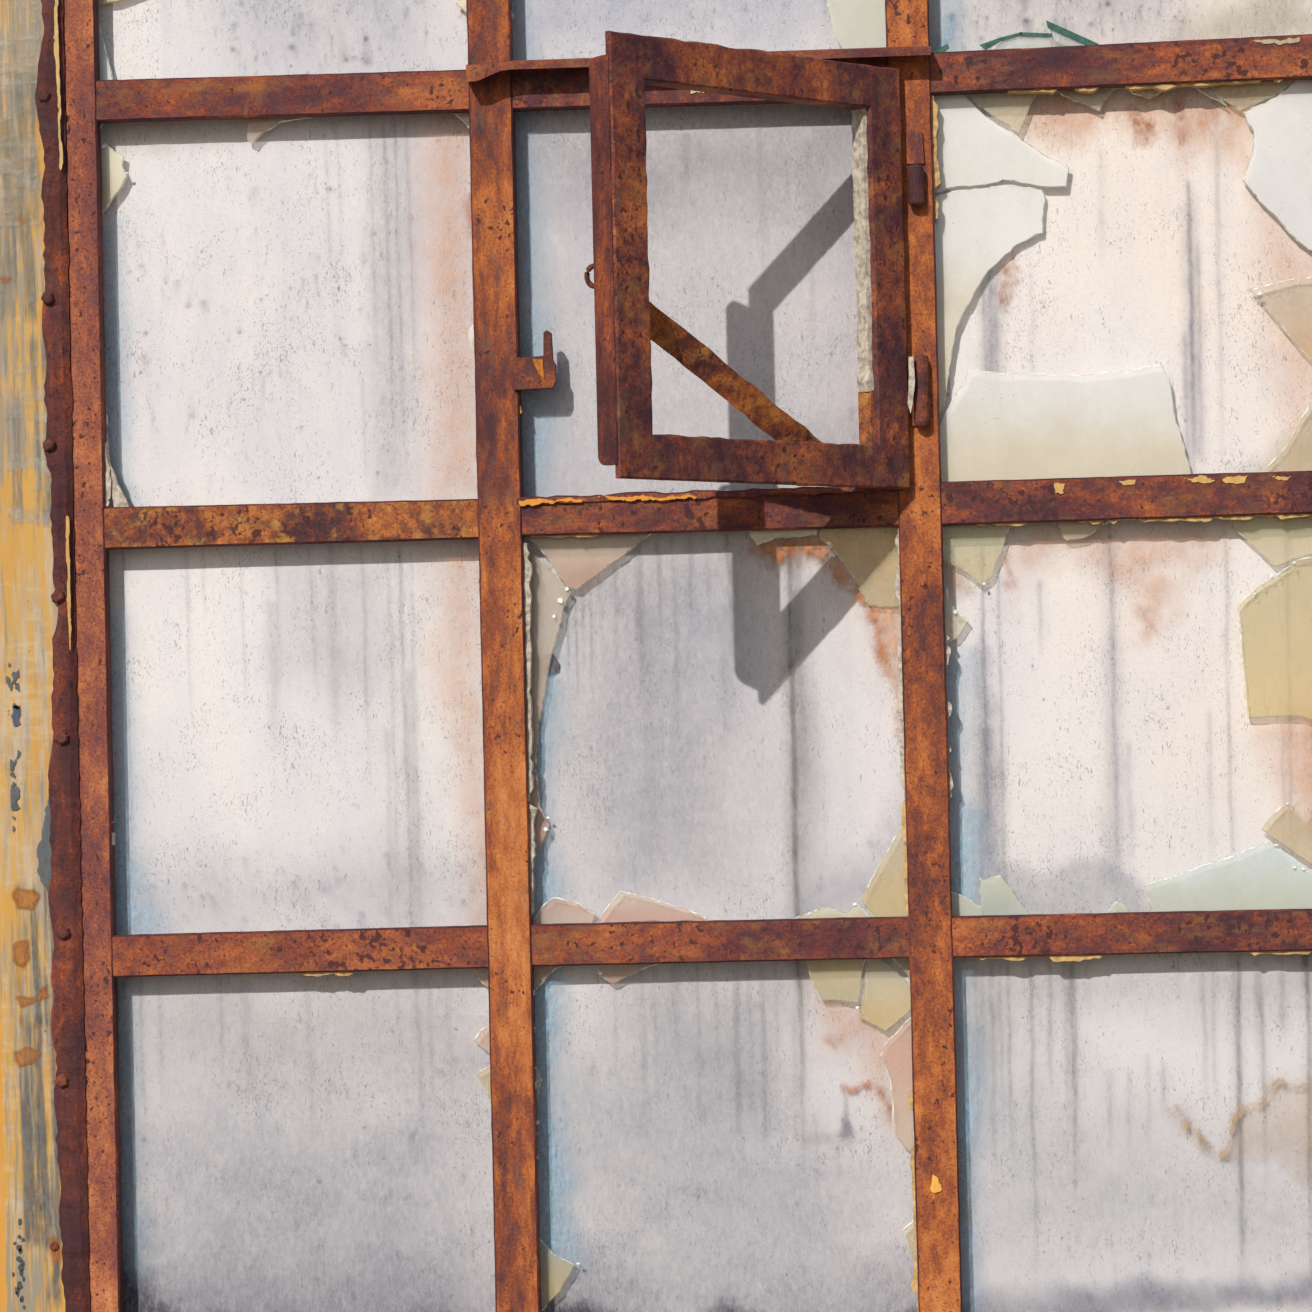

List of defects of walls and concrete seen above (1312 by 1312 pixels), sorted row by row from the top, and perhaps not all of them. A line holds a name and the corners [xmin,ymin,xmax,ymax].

peeling [36,0,63,170]
peeling [1,79,35,314]
rust [858,391,874,445]
rust [751,534,896,674]
peeling [6,663,21,726]
peeling [10,750,20,832]
rust [12,888,39,909]
rust [13,940,29,967]
rust [16,986,48,1008]
rust [14,1047,40,1067]
peeling [12,796,61,1309]
damp [123,1261,182,1312]